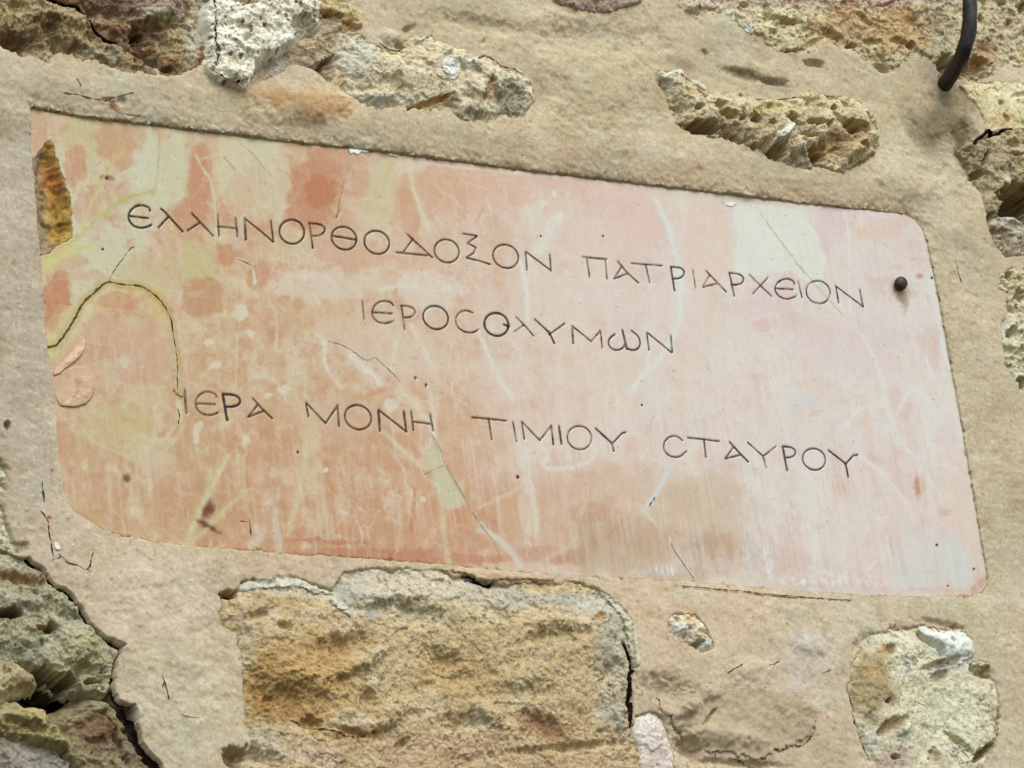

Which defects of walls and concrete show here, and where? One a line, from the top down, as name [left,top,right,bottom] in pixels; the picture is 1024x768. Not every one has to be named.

crack [47,247,180,424]
crack [330,341,400,382]
crack [425,435,542,588]
crack [24,482,159,768]
crack [622,644,683,747]
flaking render [888,617,975,665]